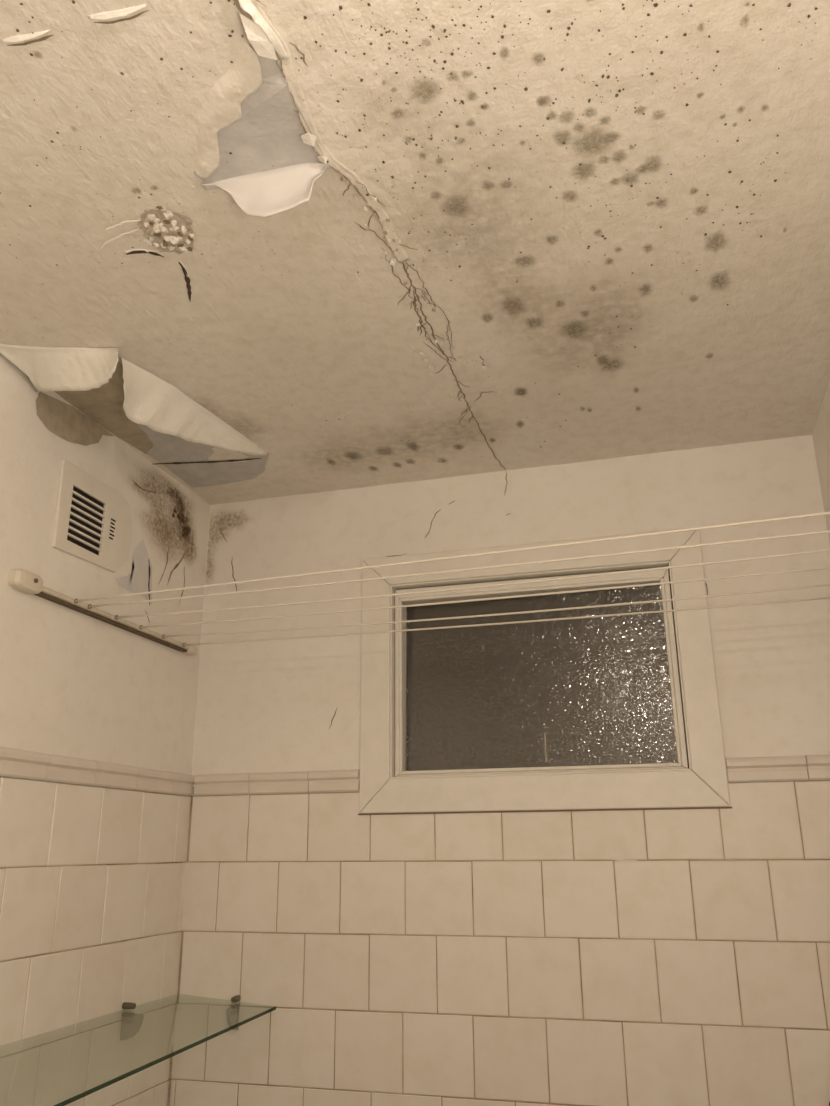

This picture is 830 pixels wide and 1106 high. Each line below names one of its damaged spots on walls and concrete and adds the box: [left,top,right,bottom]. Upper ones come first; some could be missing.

peeling [194,0,331,217]
damp [335,0,515,148]
damp [405,84,507,172]
damp [521,51,634,150]
crack [254,0,511,515]
peeling [0,344,270,488]